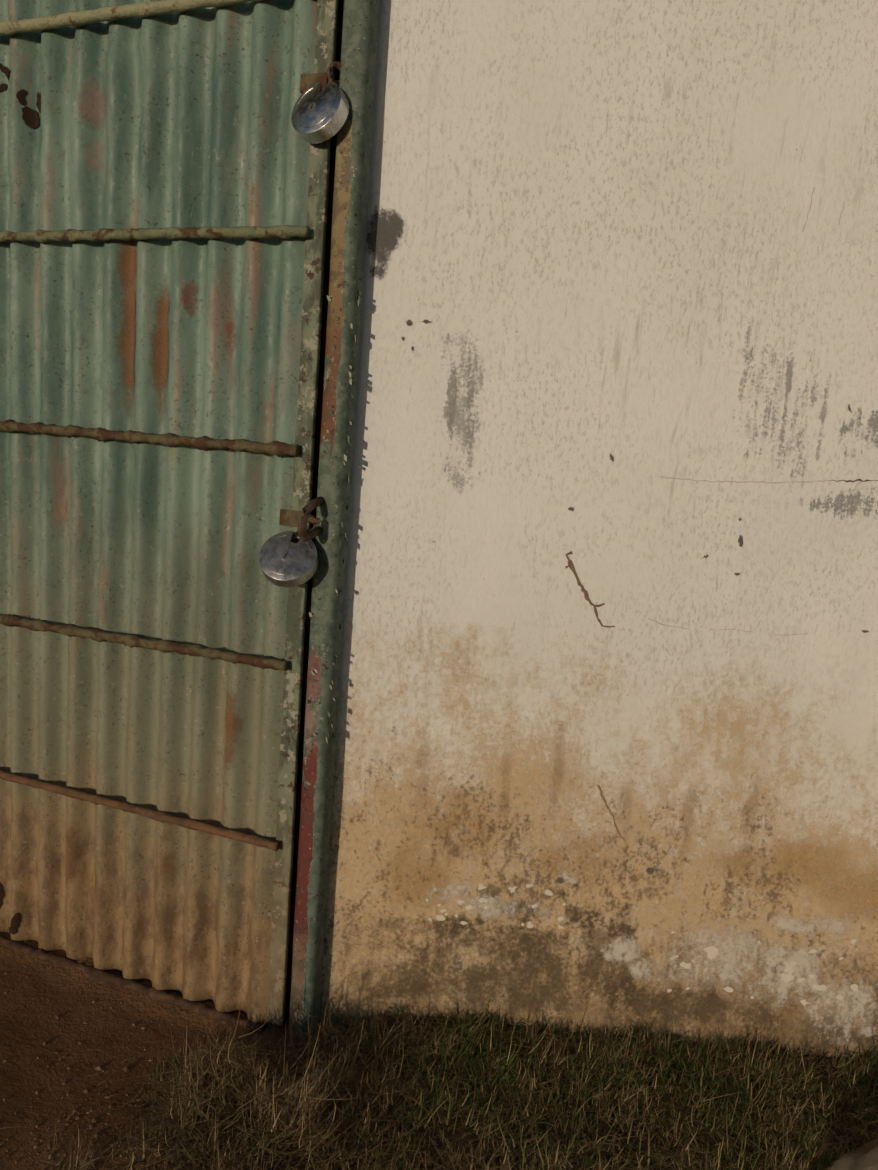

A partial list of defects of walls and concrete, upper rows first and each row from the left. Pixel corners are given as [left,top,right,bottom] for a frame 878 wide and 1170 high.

damp [367,209,404,279]
rust [119,240,135,389]
rust [153,293,169,389]
damp [738,330,827,476]
crack [661,477,878,494]
damp [361,901,727,1028]